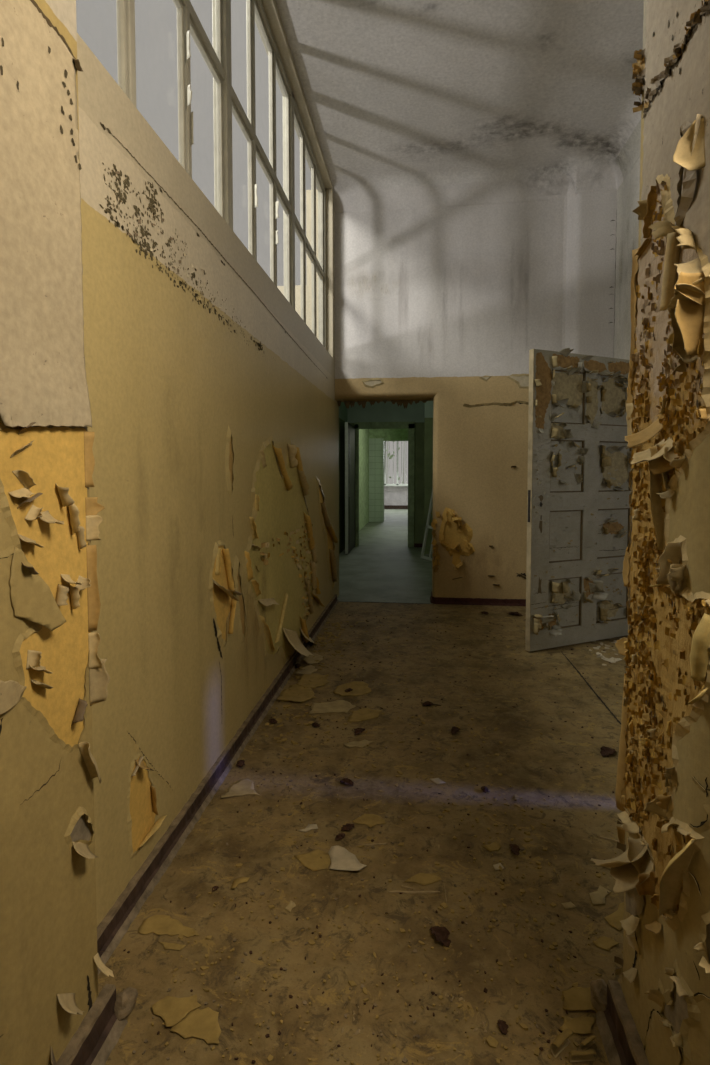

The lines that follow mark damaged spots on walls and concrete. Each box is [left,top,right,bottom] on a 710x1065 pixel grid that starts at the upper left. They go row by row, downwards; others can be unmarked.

peeling [100,162,263,353]
peeling [209,425,338,665]
peeling [431,507,475,580]
peeling [507,0,710,984]
peeling [0,422,110,783]
peeling [64,806,99,859]
peeling [127,753,167,859]
peeling [559,987,598,1051]
peeling [643,958,701,1065]